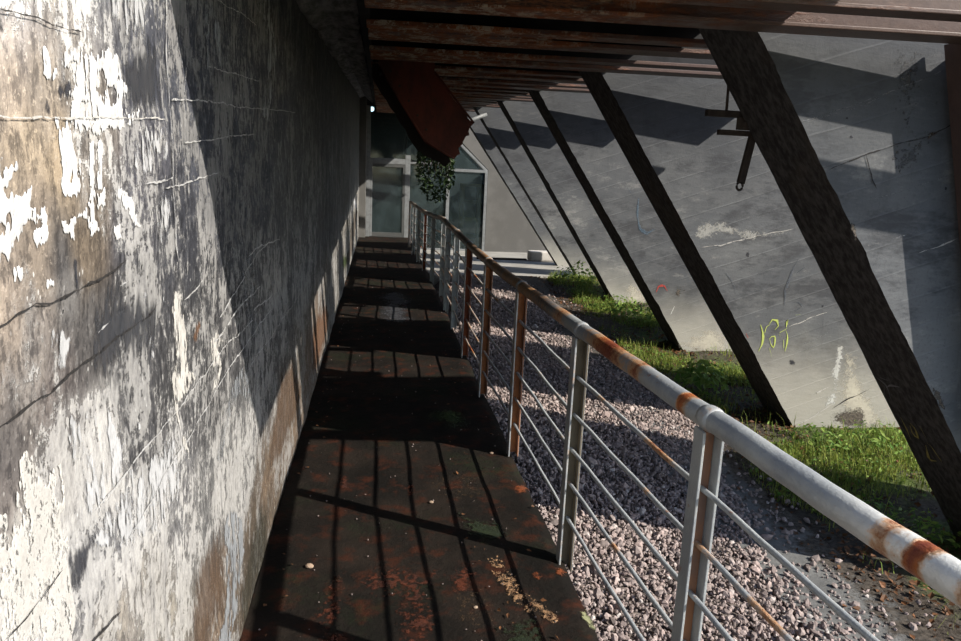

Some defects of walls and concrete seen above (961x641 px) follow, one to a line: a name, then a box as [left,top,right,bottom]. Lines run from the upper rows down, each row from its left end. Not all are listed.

crack [1,9,81,32]
peeling [112,0,145,35]
water stain [126,42,162,111]
peeling [43,45,168,240]
crack [831,125,950,187]
peeling [0,161,49,282]
crack [0,259,128,328]
crack [0,307,156,427]
crack [8,569,64,638]
peeling [0,451,75,641]
corrosion [242,511,268,624]
corrosion [361,569,436,641]